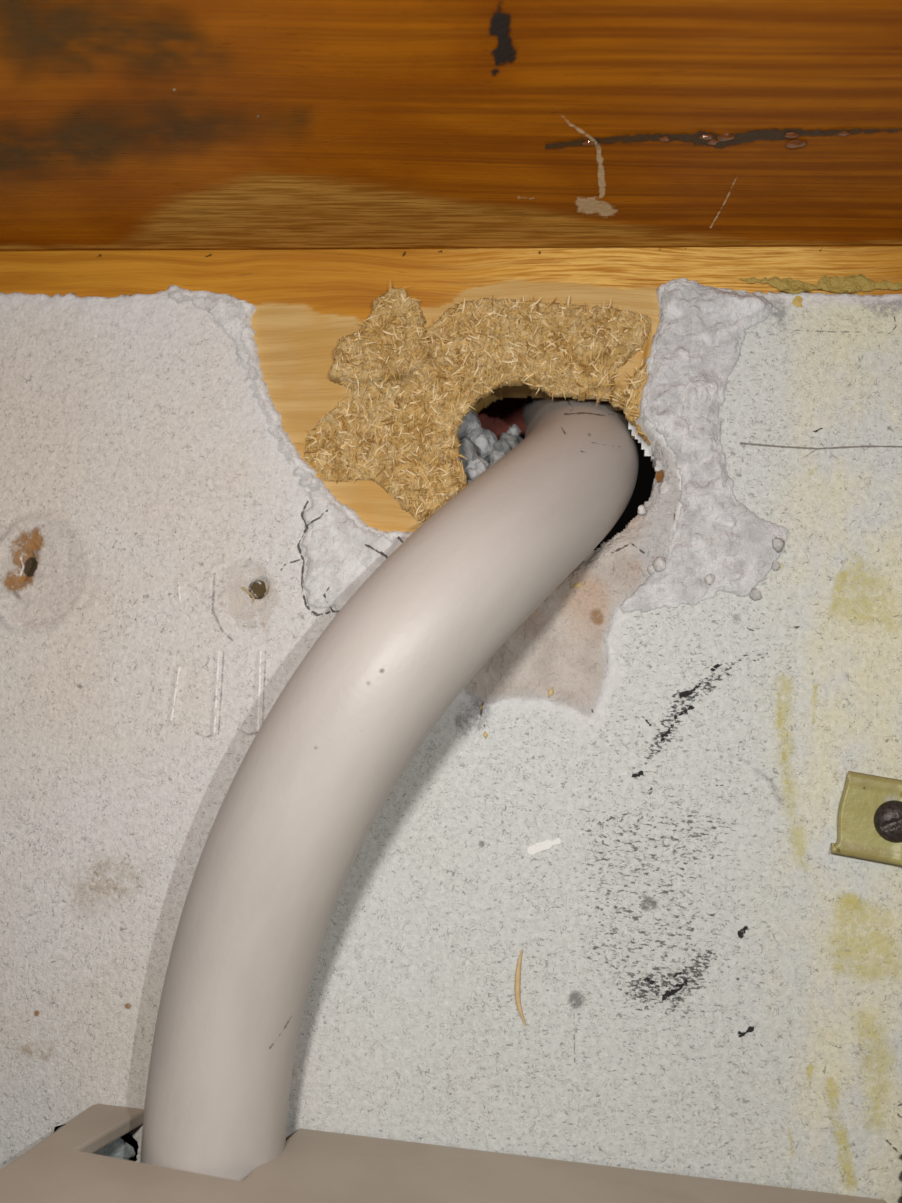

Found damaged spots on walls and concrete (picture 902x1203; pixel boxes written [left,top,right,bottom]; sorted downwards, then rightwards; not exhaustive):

leakage [0,0,192,68]
leakage [0,111,219,171]
spalling [169,290,407,611]
spalling [464,281,788,716]